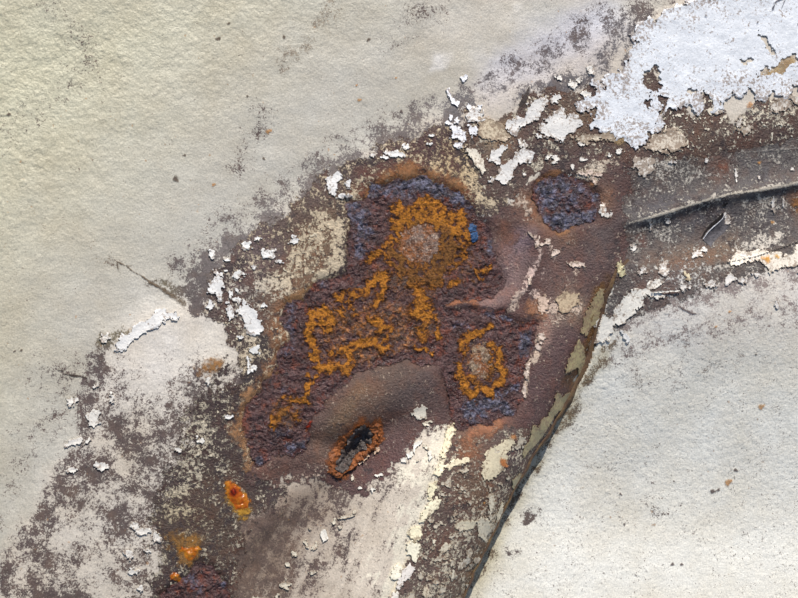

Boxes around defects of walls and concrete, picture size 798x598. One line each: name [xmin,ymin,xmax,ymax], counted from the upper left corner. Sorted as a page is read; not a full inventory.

corrosion [531,170,601,236]
crack [701,202,731,247]
corrosion [230,160,547,472]
peeling [222,400,238,433]
peeling [246,358,459,498]
corrosion [224,481,251,520]
corrosion [160,533,230,598]